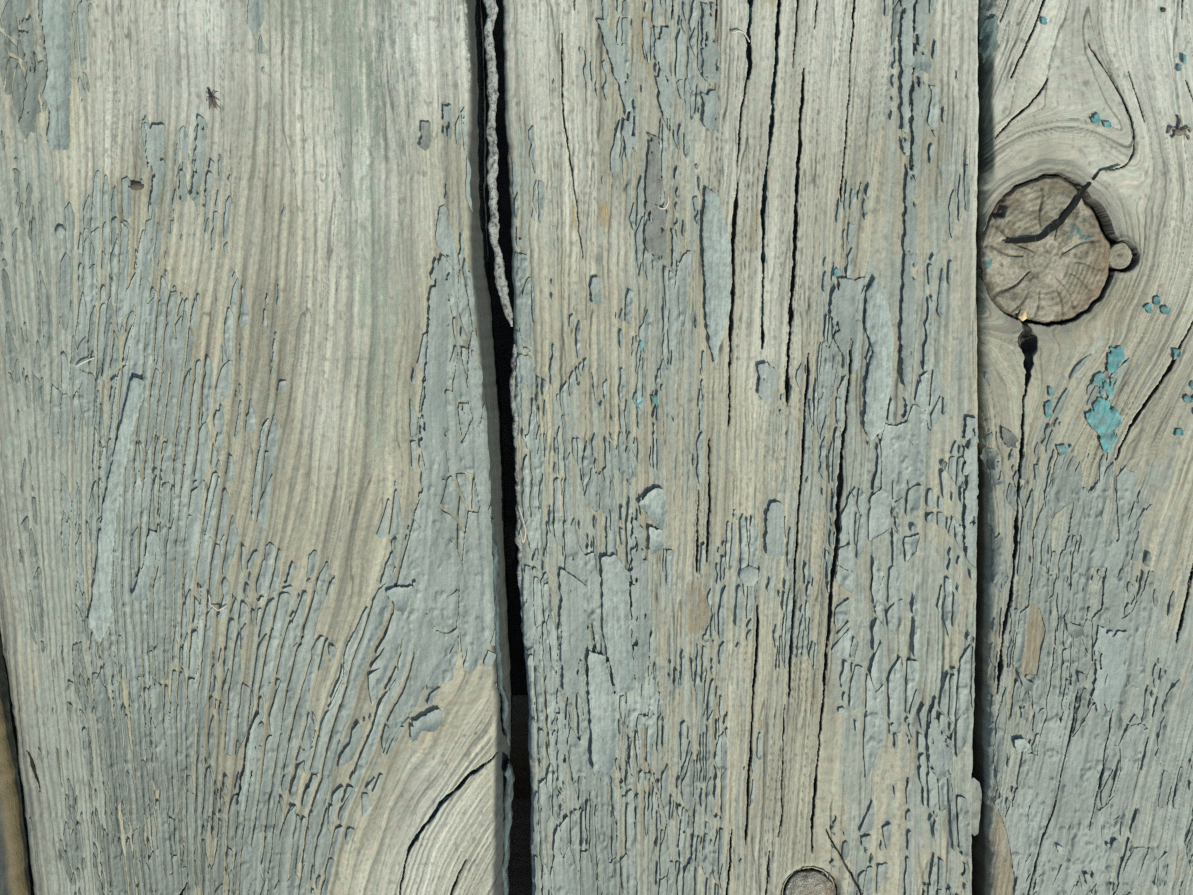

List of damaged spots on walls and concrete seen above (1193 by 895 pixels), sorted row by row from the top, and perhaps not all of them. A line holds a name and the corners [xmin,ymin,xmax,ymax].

peeling [0,0,93,151]
peeling [247,0,266,54]
crack [561,50,583,253]
crack [1000,0,1044,77]
crack [1005,44,1145,271]
peeling [0,107,496,895]
crack [696,0,861,895]
peeling [512,0,1193,895]
crack [996,316,1062,694]
crack [1115,321,1193,459]
crack [1176,563,1193,642]
crack [399,752,498,895]